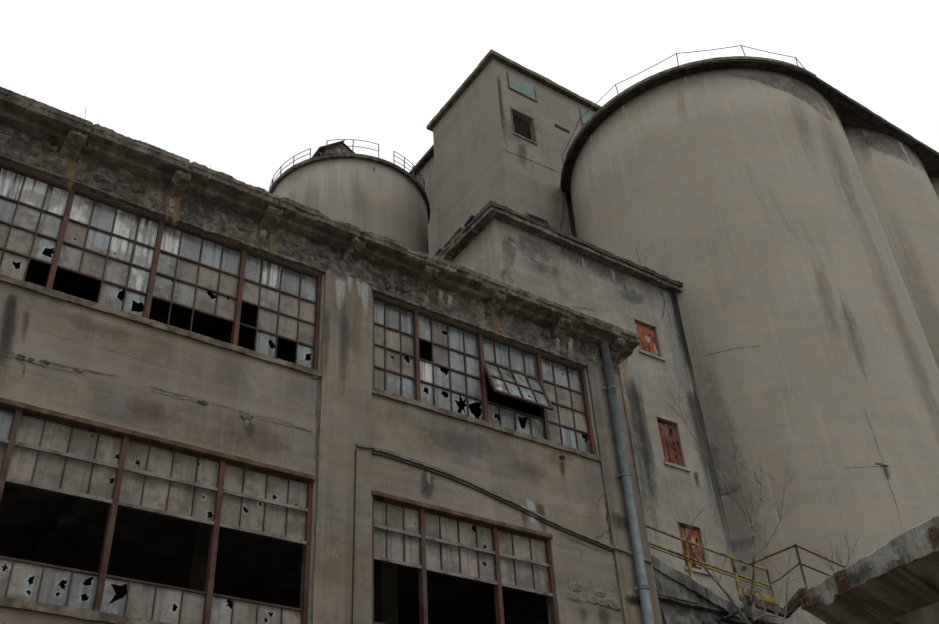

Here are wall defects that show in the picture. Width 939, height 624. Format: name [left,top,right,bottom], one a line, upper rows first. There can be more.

damp [2,296,15,354]
crack [0,349,120,378]
crack [148,378,320,463]